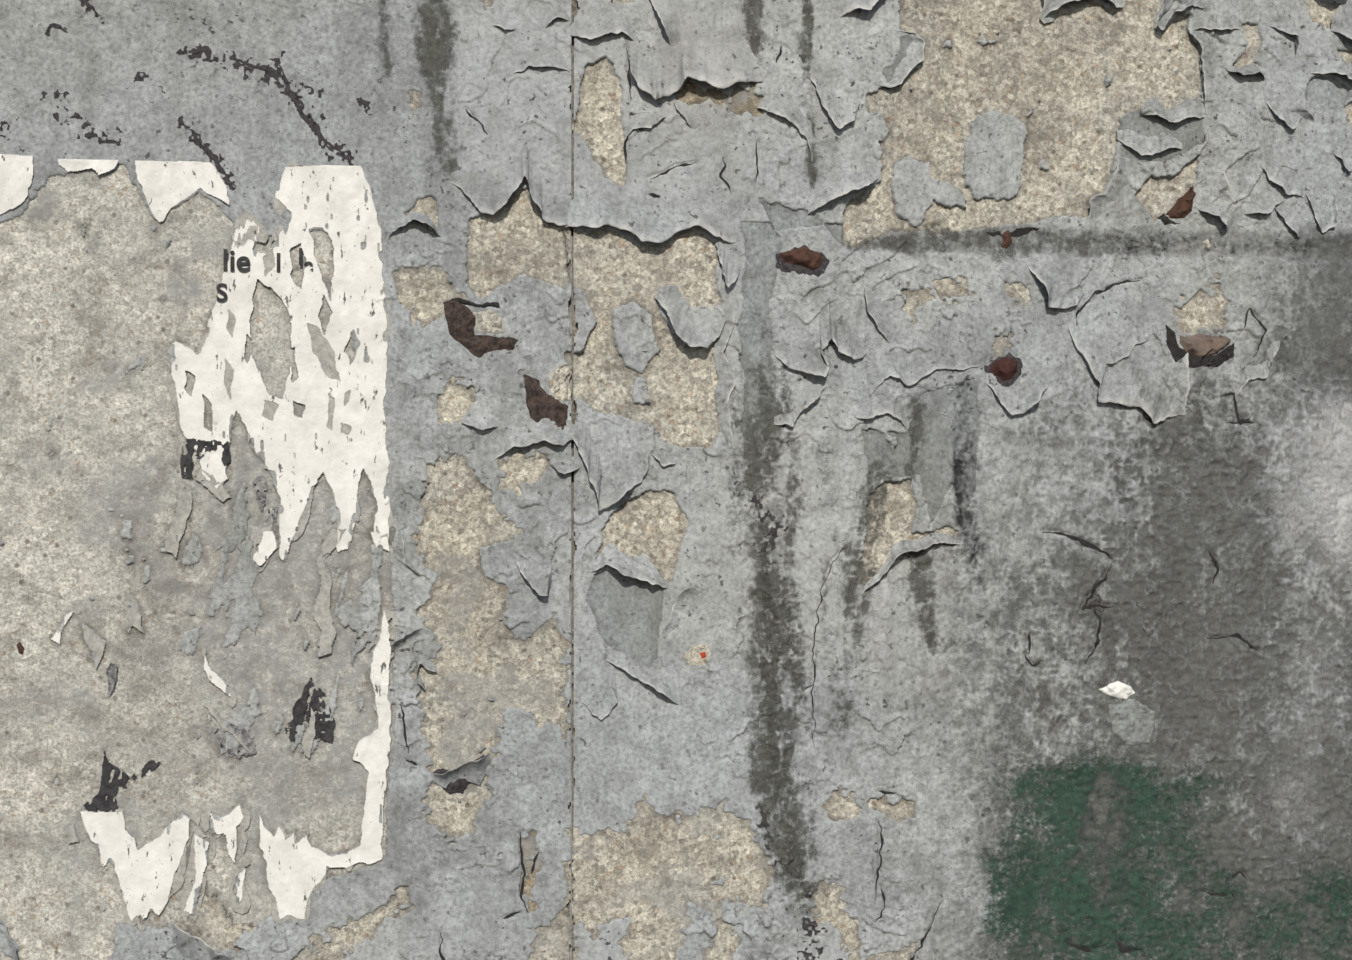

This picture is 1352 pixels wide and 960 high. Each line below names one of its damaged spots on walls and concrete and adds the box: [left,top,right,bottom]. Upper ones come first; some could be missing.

peeling [1265,0,1352,129]
peeling [1135,158,1338,239]
peeling [1333,139,1352,171]
peeling [389,0,1265,705]
peeling [1238,340,1280,393]
peeling [0,165,574,960]
leakage [735,364,817,925]
leakage [984,235,1352,960]
peeling [529,794,920,960]
peeling [823,785,916,823]